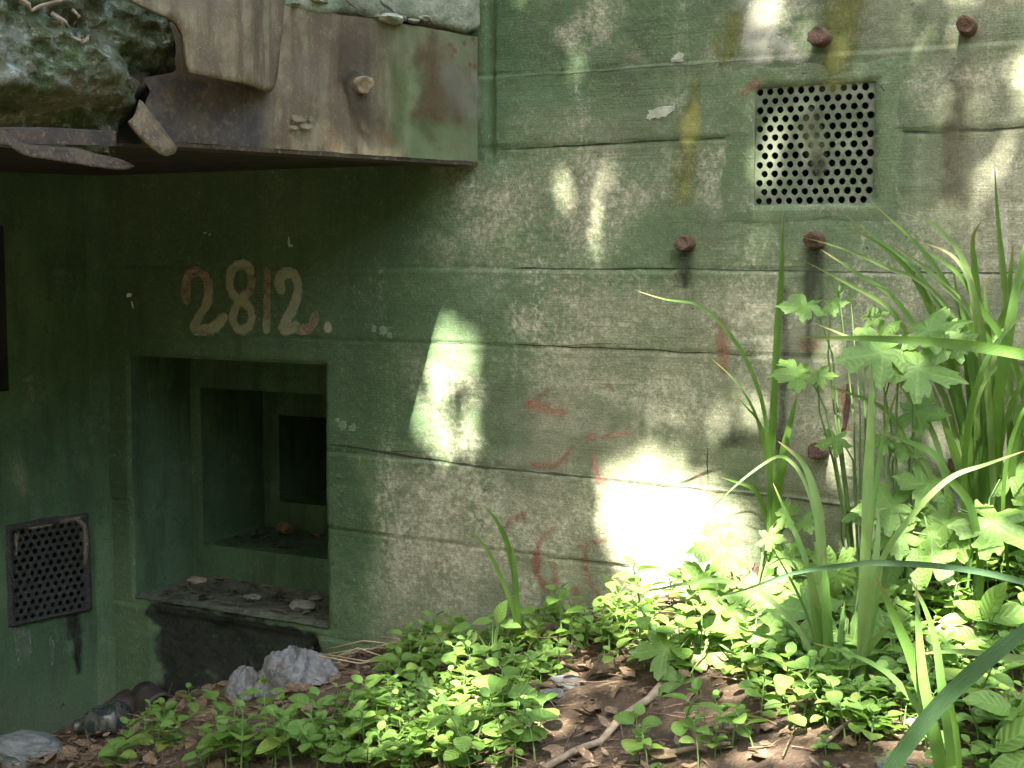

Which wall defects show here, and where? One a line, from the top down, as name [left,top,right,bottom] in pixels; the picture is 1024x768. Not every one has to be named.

peeling [646,106,675,121]
water stain [67,605,82,673]
water stain [305,632,319,653]